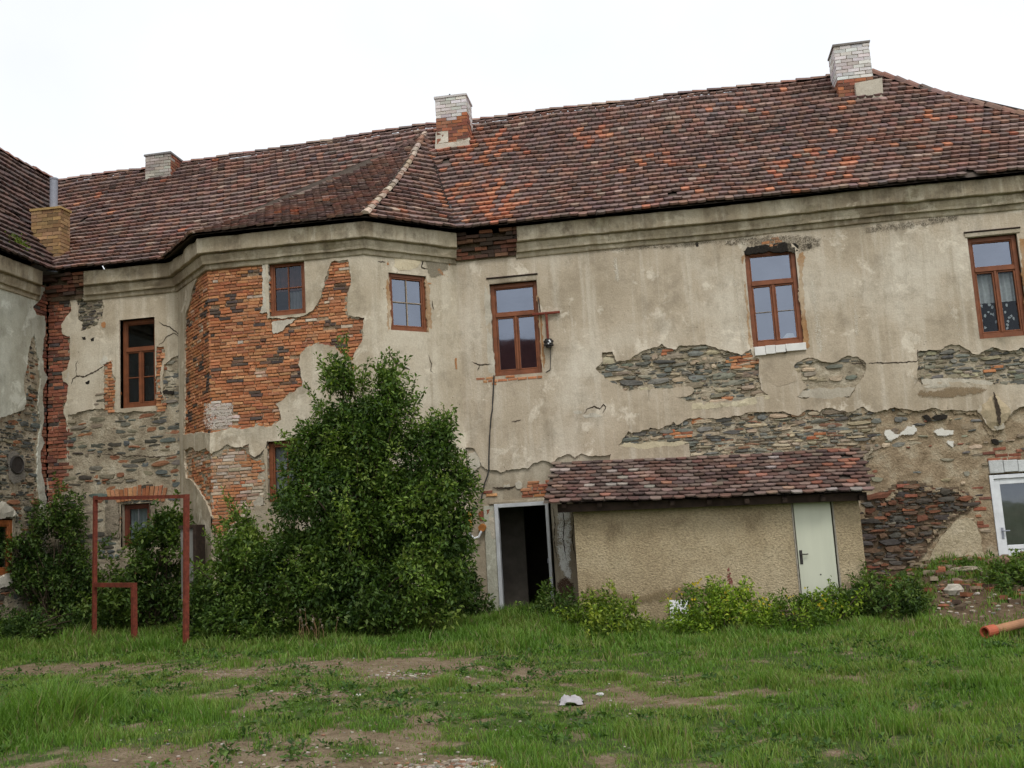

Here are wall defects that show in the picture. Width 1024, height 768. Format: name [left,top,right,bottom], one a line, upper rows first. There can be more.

flaking render [0,260,364,629]
peeling [98,655,584,768]
spalling [466,344,1024,612]
peeling [934,576,1024,624]